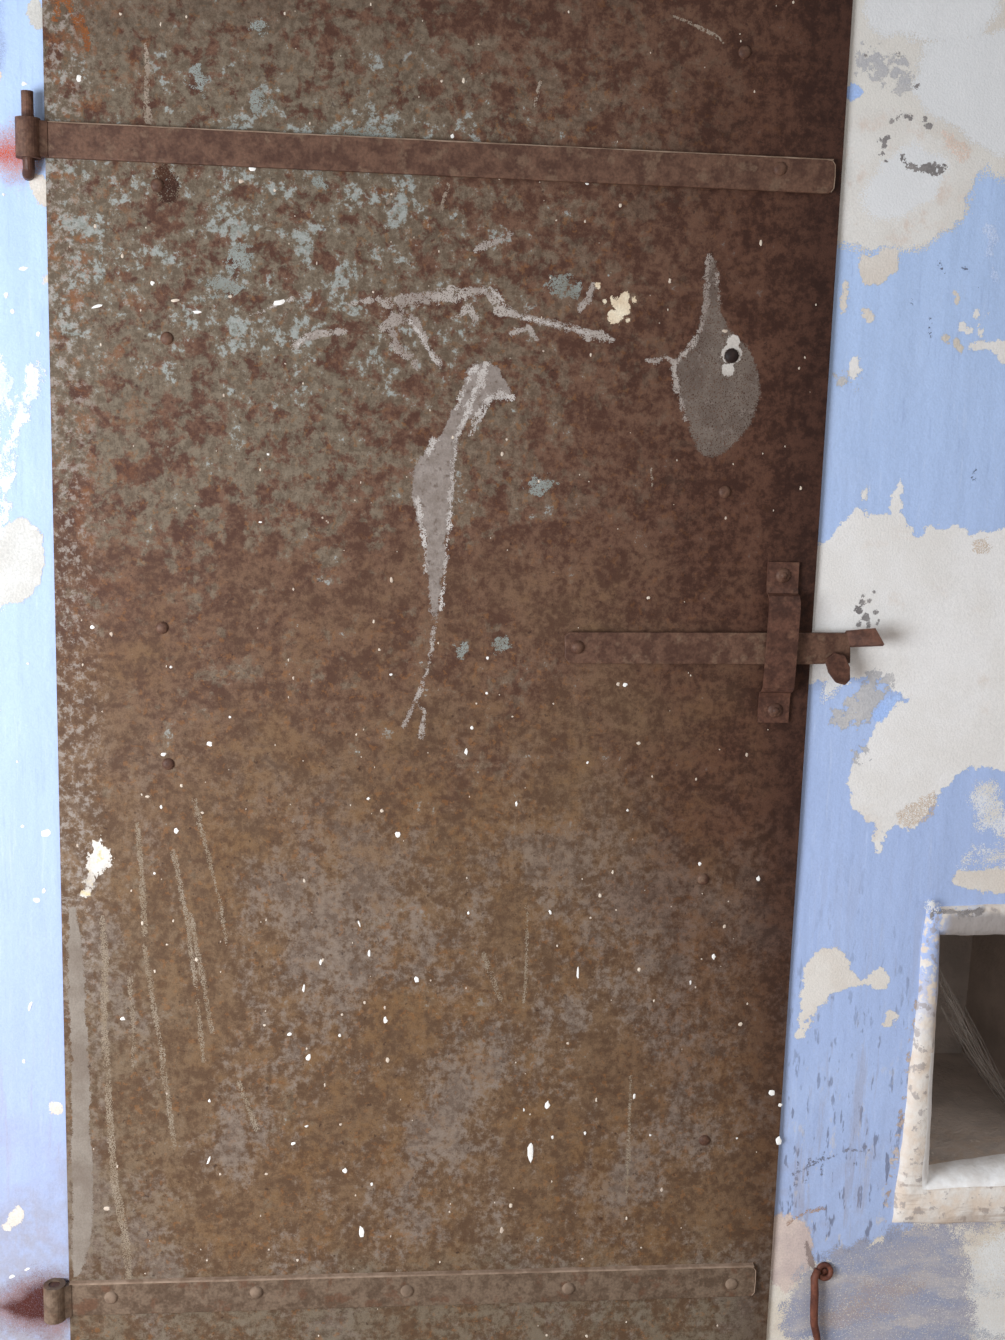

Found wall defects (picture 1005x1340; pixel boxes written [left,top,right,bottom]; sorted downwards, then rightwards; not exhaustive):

rust [51,0,91,52]
water stain [854,41,920,97]
rust [0,120,46,195]
peeling [838,106,986,323]
peeling [833,355,863,391]
peeling [941,308,1005,365]
peeling [0,354,47,612]
peeling [809,478,1005,854]
peeling [794,946,890,1040]
flaking render [766,998,1005,1340]
rust [0,1261,70,1340]